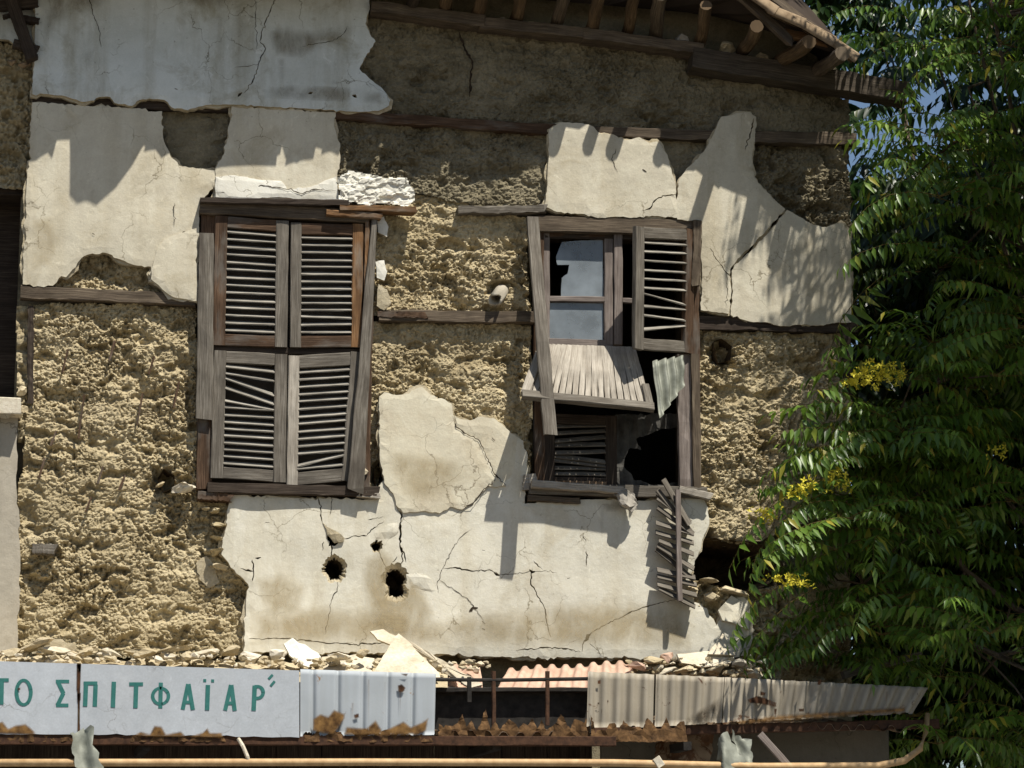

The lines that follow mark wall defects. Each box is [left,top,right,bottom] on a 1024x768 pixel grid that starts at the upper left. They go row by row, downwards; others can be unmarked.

spalling [153,111,230,169]
spalling [337,18,852,486]
crack [730,216,781,277]
spalling [17,255,248,659]
spalling [700,330,852,544]
crack [318,497,405,564]
crack [437,414,539,630]
spalling [321,554,347,583]
spalling [381,562,409,603]
crack [268,586,379,645]
crack [522,602,663,652]
rust [304,703,718,743]